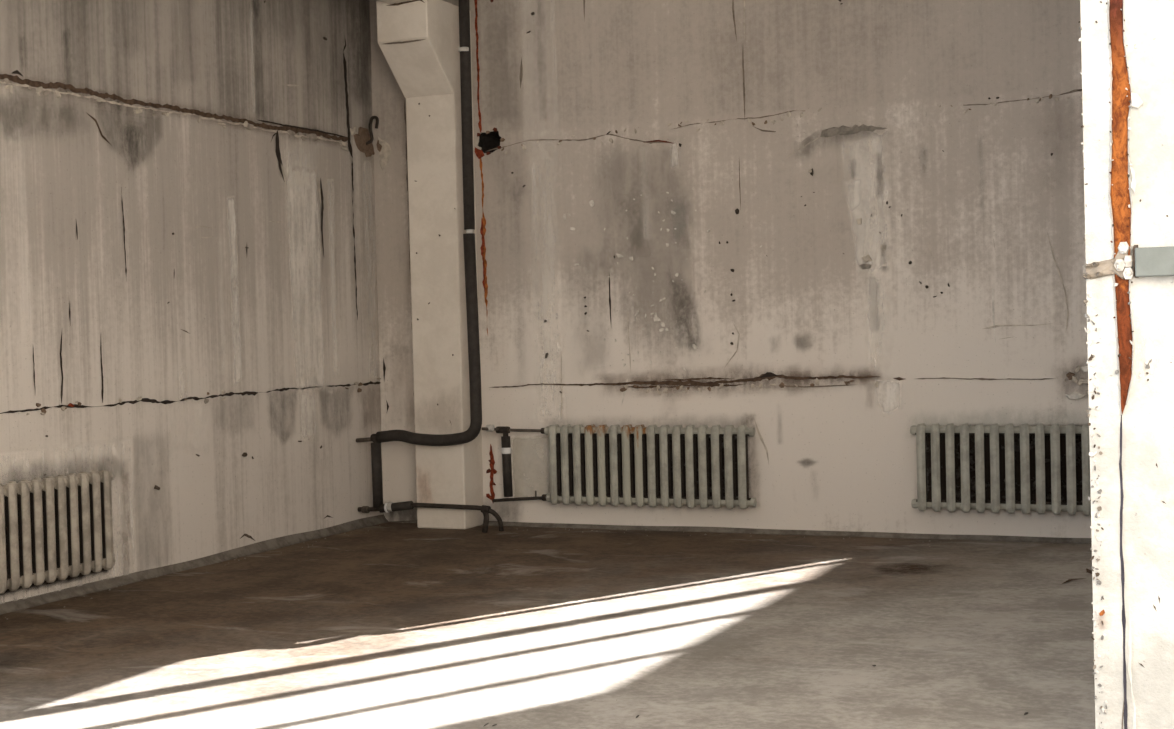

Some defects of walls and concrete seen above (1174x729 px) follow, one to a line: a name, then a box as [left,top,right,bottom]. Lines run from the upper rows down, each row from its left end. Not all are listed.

rust [474,0,482,133]
crack [0,34,358,320]
crack [404,100,412,314]
rust [475,147,488,308]
crack [0,305,414,415]
crack [490,372,1053,395]
rust [486,444,497,503]